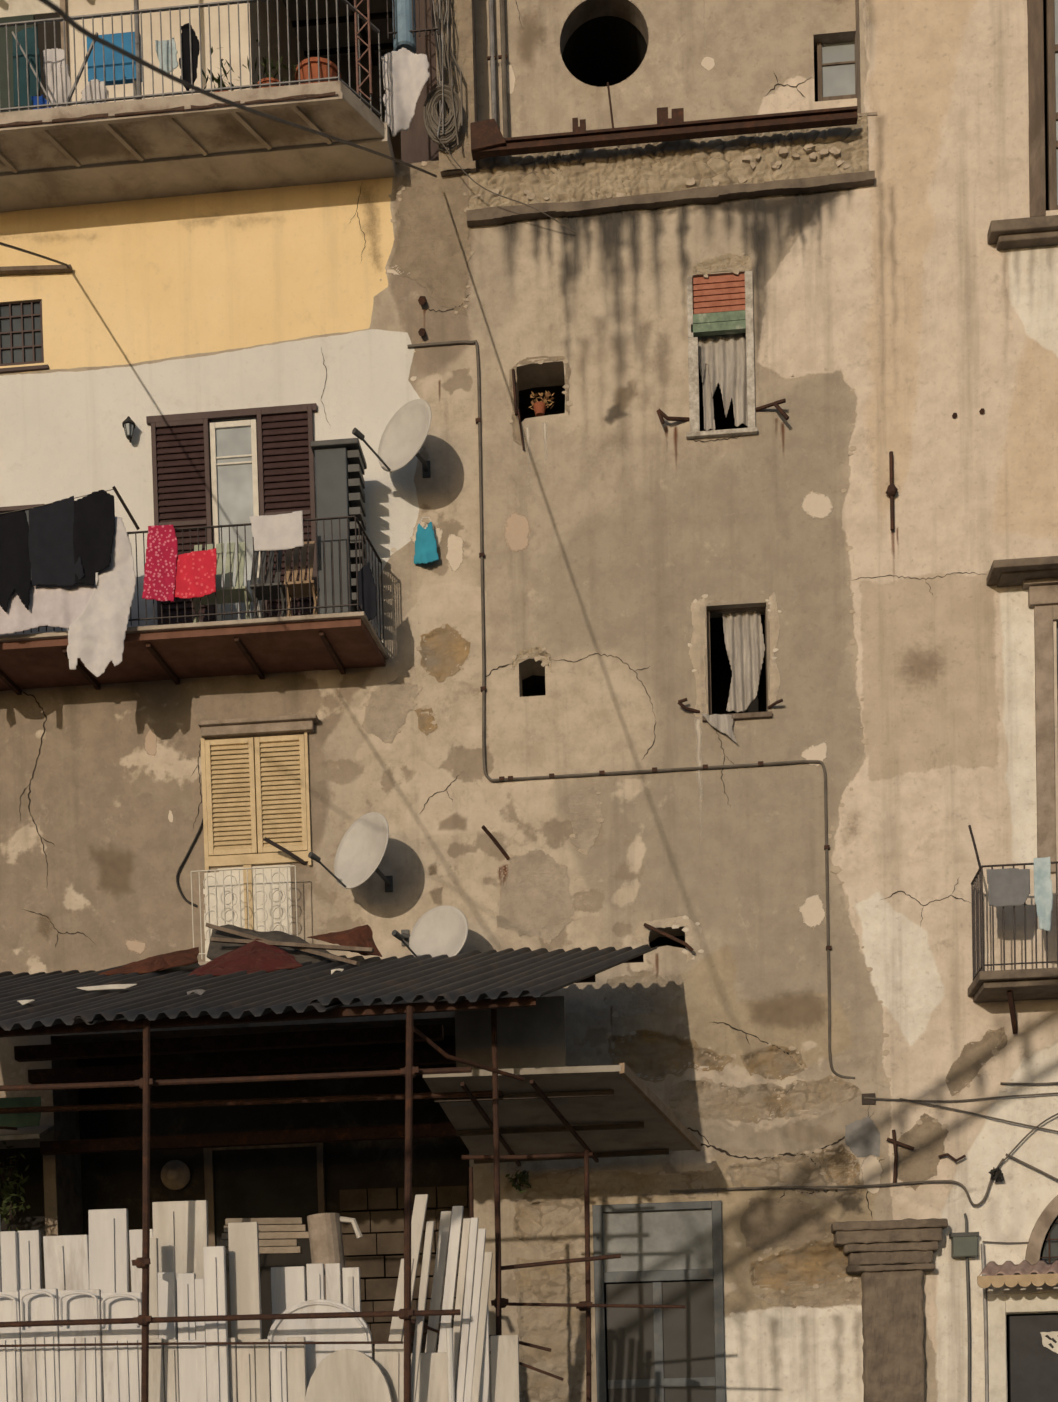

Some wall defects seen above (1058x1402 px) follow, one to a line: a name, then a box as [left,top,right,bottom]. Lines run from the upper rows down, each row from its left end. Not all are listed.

crack [769,71,810,97]
leakage [502,208,661,289]
spalling [380,112,868,316]
leakage [678,204,687,268]
leakage [704,192,835,288]
spalling [362,623,470,744]
crack [551,653,656,757]
crack [19,691,55,876]
spalling [632,915,704,962]
crack [885,878,970,926]
spalling [604,968,891,1124]
spalling [513,1143,862,1402]